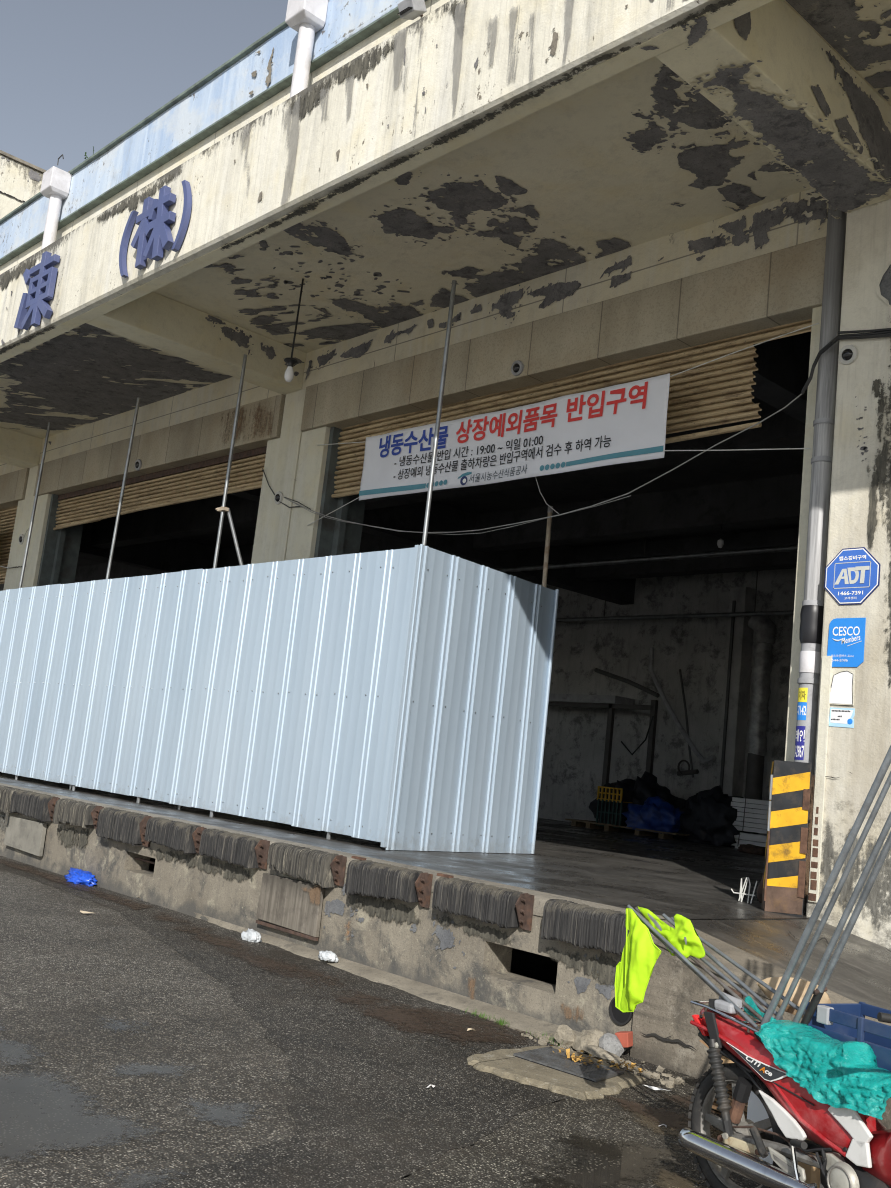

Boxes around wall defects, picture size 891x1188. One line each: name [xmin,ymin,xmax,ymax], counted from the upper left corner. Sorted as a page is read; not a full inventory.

water stain [221,0,740,249]
peeling [623,0,891,261]
peeling [0,323,233,445]
peeling [204,172,632,379]
water stain [867,365,891,688]